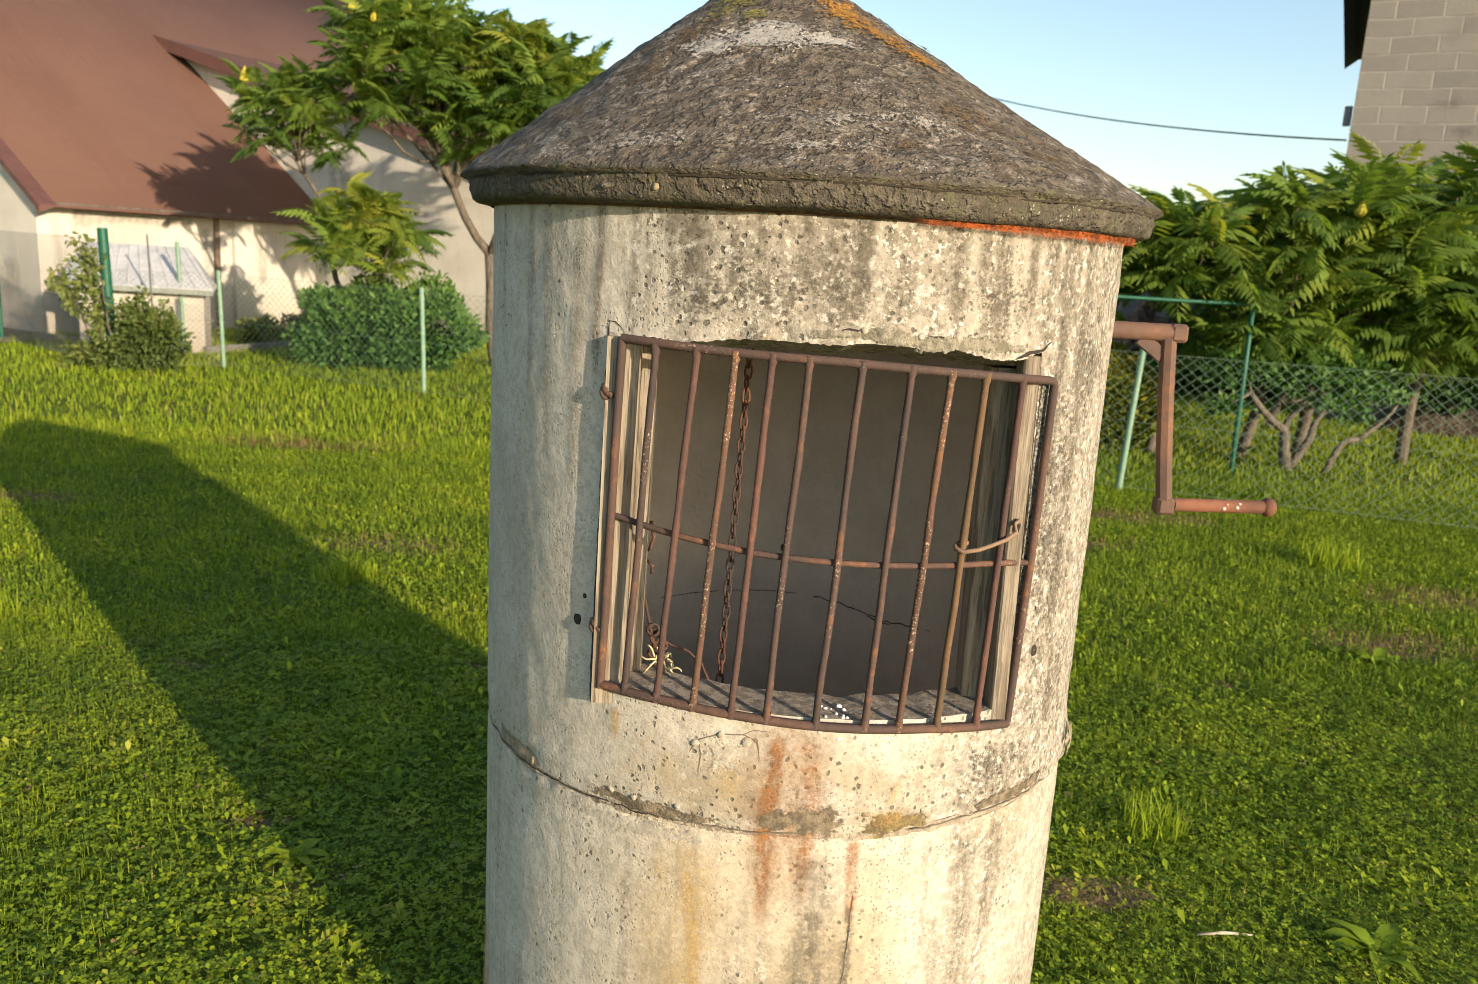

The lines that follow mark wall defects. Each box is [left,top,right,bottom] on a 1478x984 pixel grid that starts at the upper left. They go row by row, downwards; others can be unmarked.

damp [803,221,873,318]
damp [981,232,1010,332]
corrosion [928,219,1135,246]
damp [1029,235,1095,612]
corrosion [756,743,781,903]
crack [840,895,853,984]
corrosion [840,844,857,981]